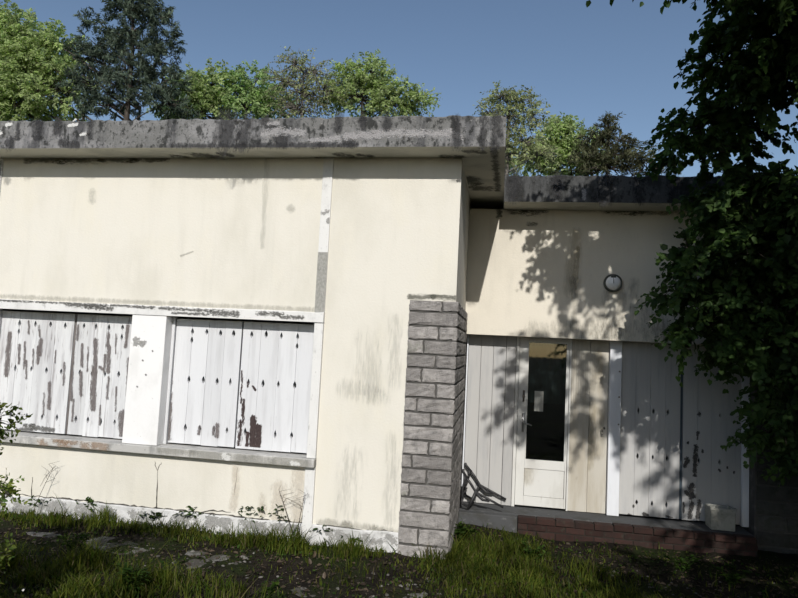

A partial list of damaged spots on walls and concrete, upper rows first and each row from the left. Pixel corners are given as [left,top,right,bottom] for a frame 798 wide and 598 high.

water stain [5,122,19,150]
water stain [24,110,546,219]
peeling [4,320,43,379]
peeling [42,382,51,416]
peeling [54,324,153,437]
peeling [683,431,704,520]